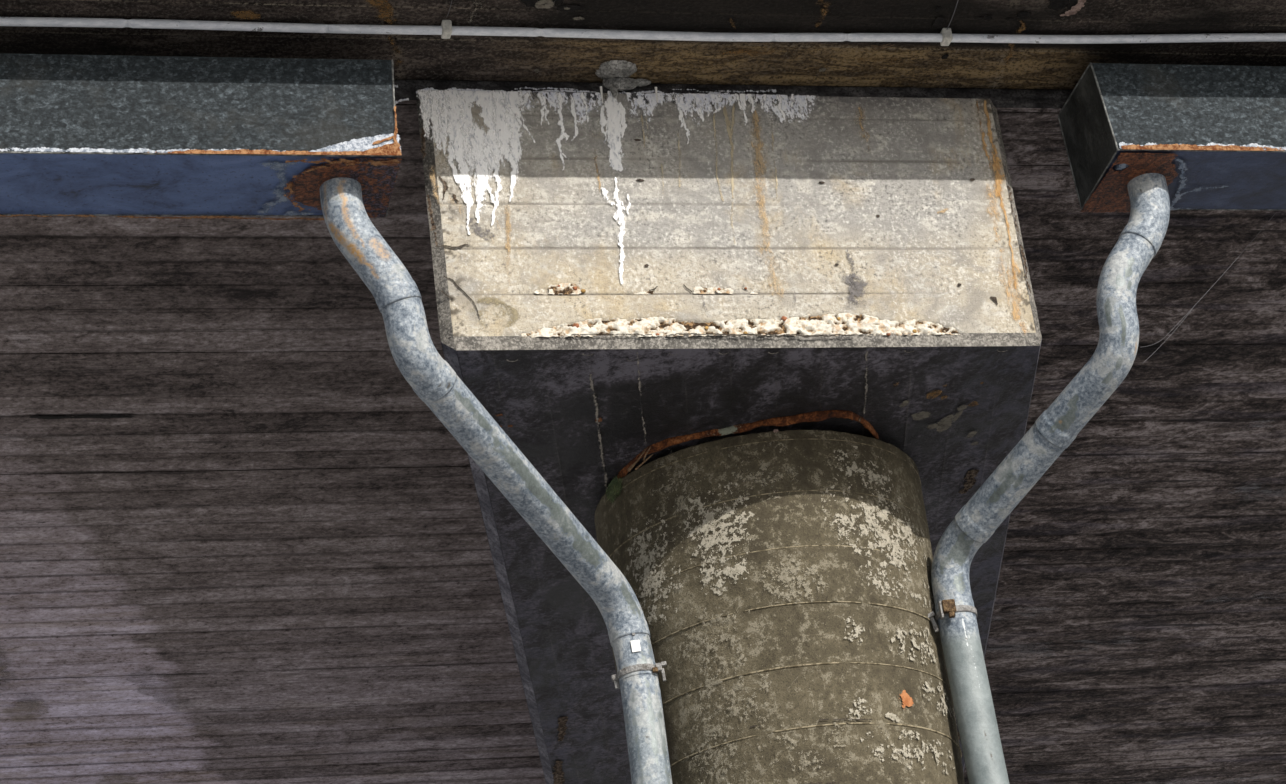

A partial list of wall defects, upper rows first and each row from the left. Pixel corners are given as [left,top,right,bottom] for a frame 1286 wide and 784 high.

rust [0,106,402,220]
damp [394,84,816,284]
rust [1081,142,1286,213]
peeling [821,446,934,608]
peeling [626,429,872,784]
peeling [887,622,957,725]
peeling [861,729,955,775]